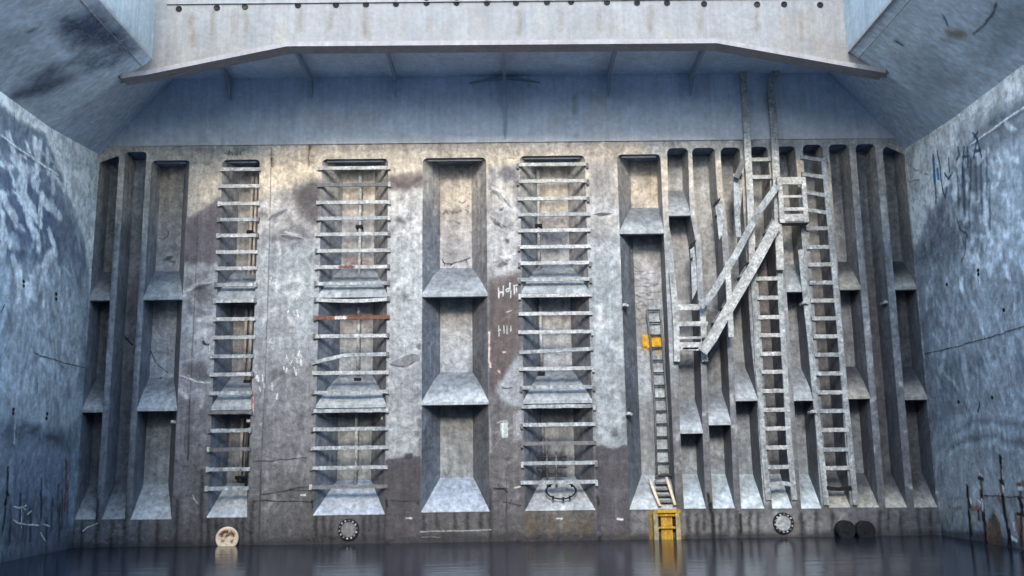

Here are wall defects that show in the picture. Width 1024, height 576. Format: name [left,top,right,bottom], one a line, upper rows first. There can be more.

water stain [63,12,132,66]
crack [925,326,1024,354]
water stain [548,453,565,475]
corrosion [989,513,1002,544]